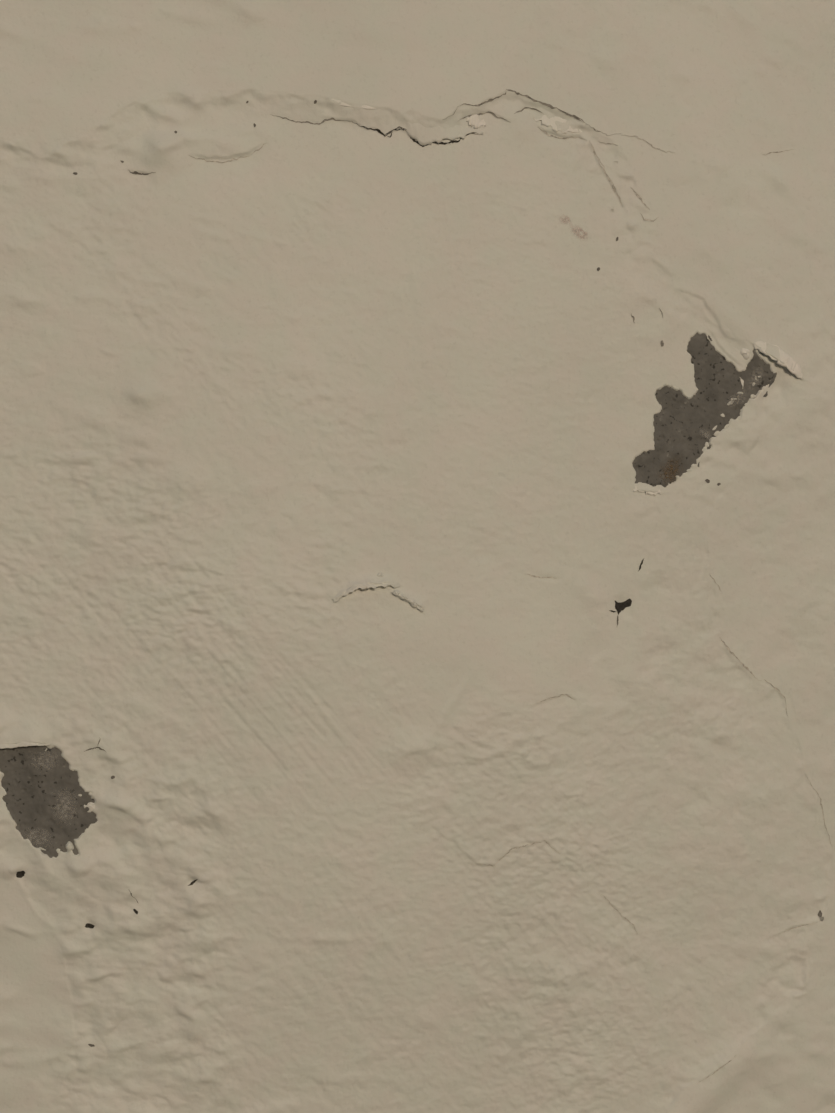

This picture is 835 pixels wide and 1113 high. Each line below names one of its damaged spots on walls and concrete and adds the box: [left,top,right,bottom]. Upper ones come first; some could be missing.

crack [355,89,668,153]
spalling [632,332,803,496]
peeling [328,572,423,620]
spalling [609,599,632,626]
spalling [0,742,98,858]